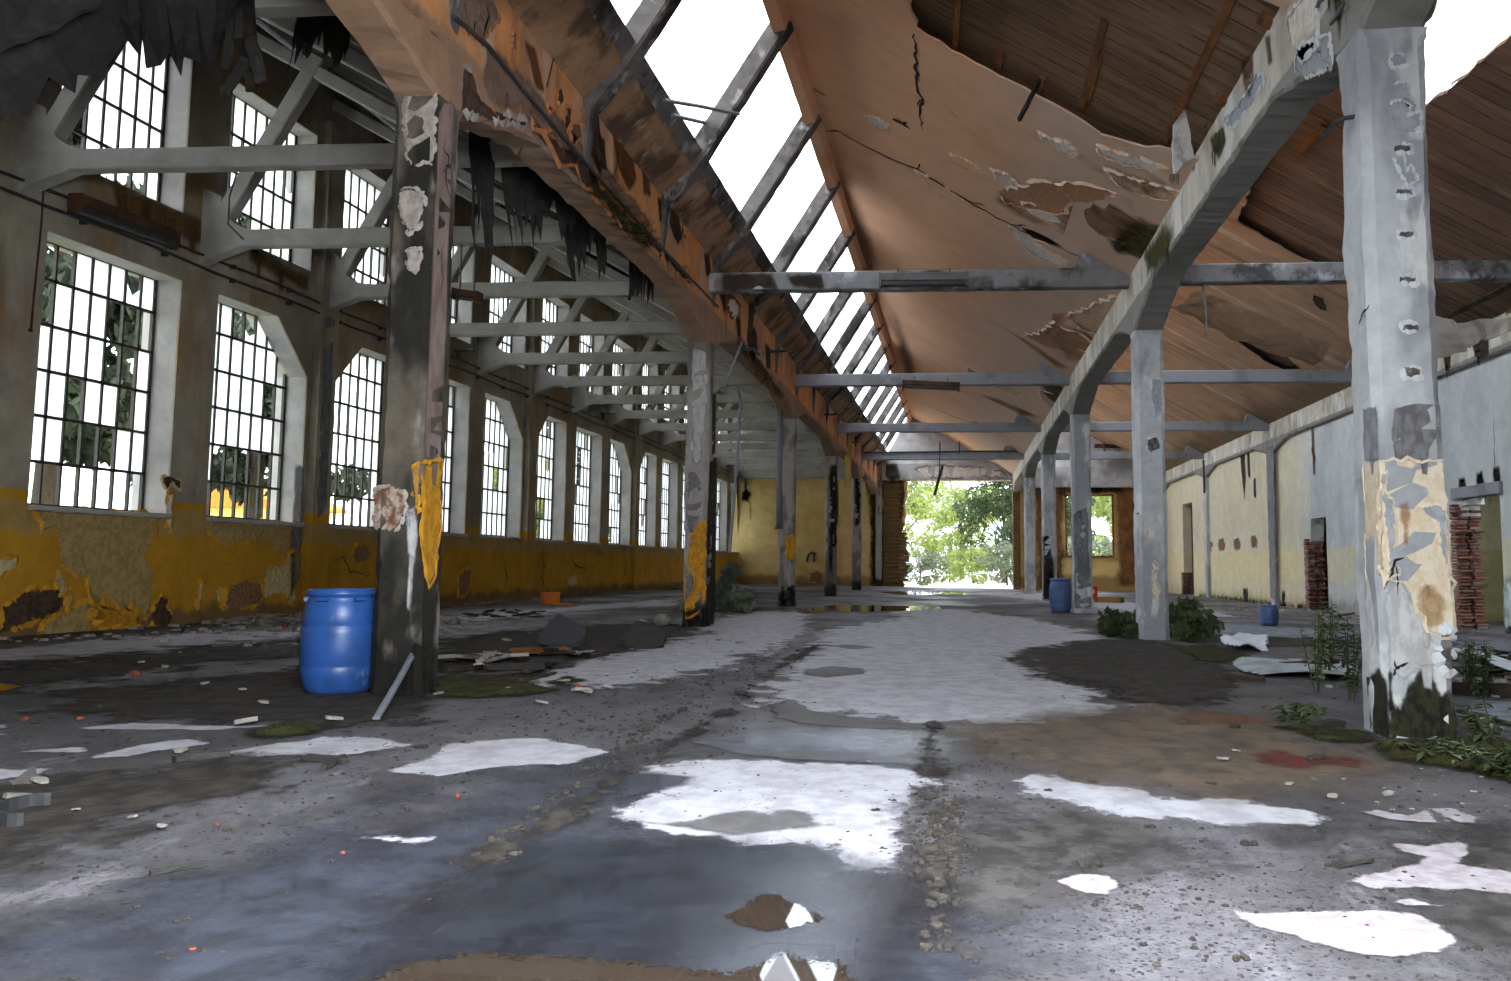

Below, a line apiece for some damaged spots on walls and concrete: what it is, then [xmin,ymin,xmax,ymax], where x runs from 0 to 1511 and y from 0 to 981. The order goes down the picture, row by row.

peeling [459,0,518,51]
peeling [401,93,438,167]
flaking render [461,63,693,288]
crack [825,34,1078,256]
flaking render [949,130,1180,223]
peeling [398,186,428,275]
flaking render [1008,224,1071,267]
flaking render [1023,294,1119,352]
peeling [0,474,182,635]
peeling [194,516,297,612]
peeling [1362,455,1458,679]